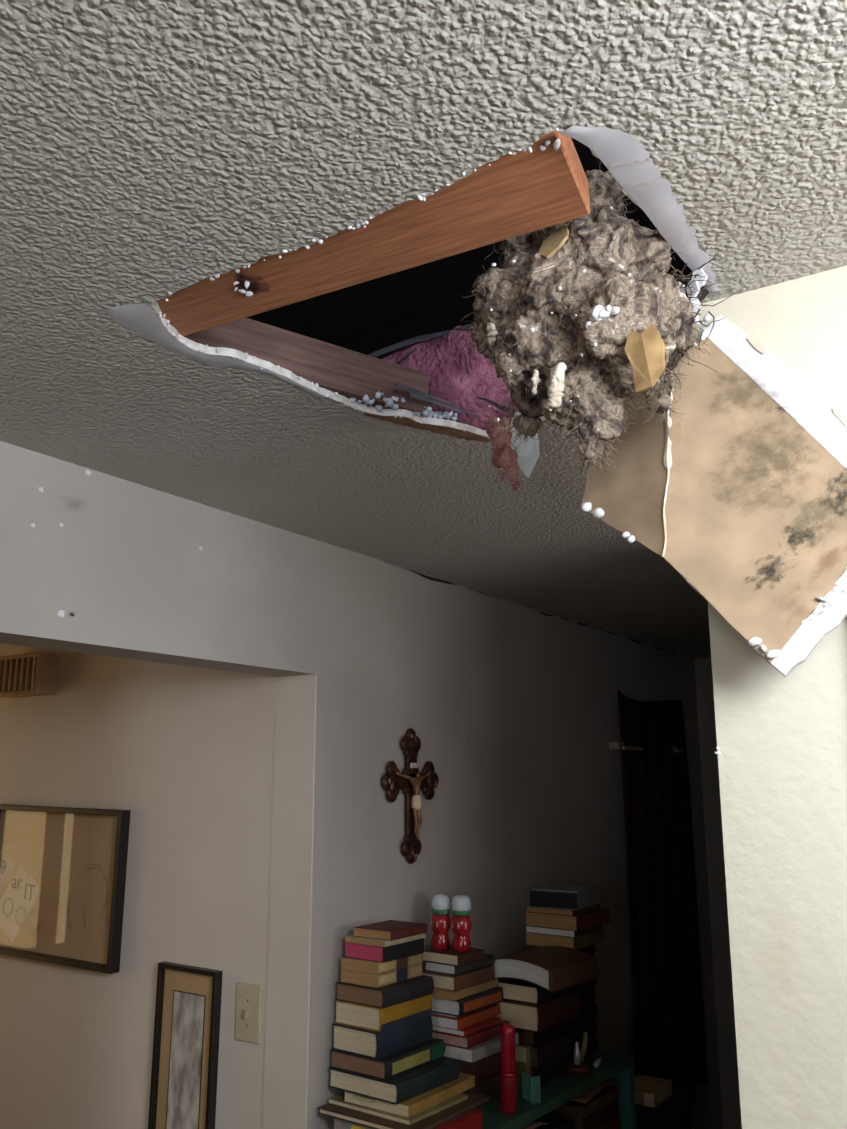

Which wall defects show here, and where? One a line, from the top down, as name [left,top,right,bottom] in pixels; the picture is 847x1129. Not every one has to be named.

peeling [575,297,620,329]
peeling [692,314,711,347]
peeling [581,502,604,518]
mould [823,474,847,515]
mould [787,526,815,546]
mould [757,558,779,589]
peeling [748,637,781,659]